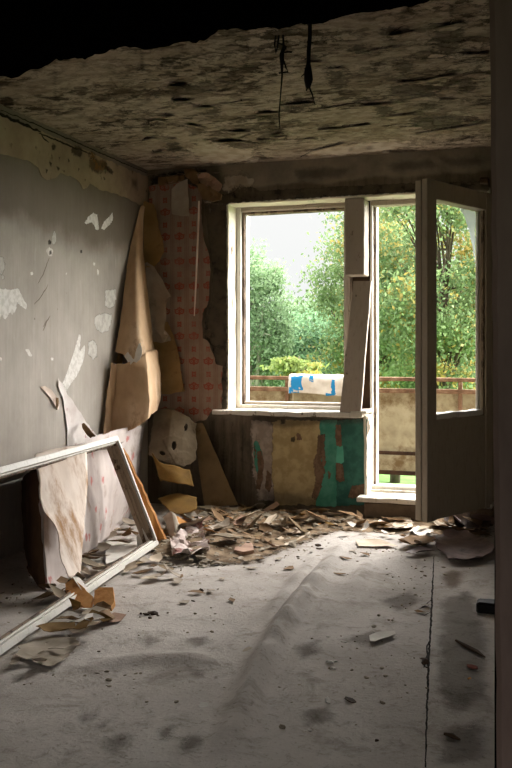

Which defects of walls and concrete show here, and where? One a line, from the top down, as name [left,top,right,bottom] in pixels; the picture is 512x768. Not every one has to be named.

peeling [0,116,148,205]
peeling [85,213,113,230]
peeling [0,257,27,319]
peeling [94,289,116,333]
peeling [59,335,97,397]
peeling [249,419,368,507]
crack [419,557,434,767]